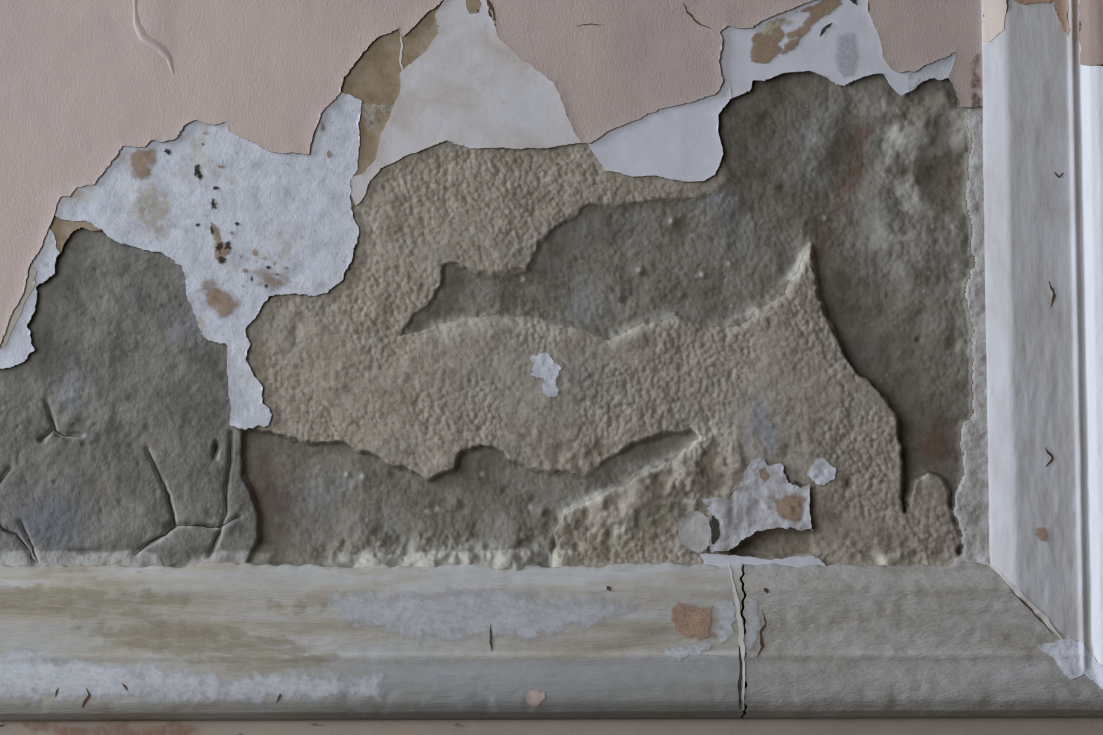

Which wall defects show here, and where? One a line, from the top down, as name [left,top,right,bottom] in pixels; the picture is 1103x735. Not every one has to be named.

peeling [982,0,1103,66]
spalling [0,0,990,571]
crack [0,521,38,563]
crack [136,444,238,554]
crack [728,562,767,710]